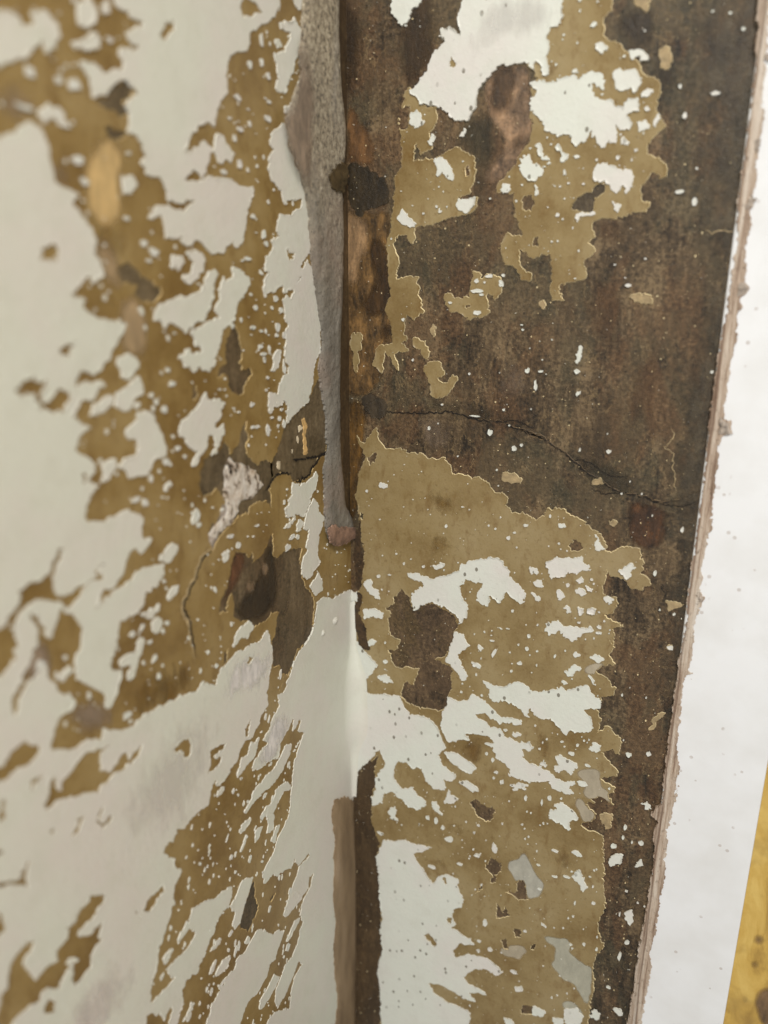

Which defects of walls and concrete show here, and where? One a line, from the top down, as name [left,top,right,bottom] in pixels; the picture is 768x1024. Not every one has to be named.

water stain [405,0,431,79]
water stain [464,68,513,159]
water stain [347,163,389,217]
peeling [372,0,668,399]
flaking render [328,0,363,513]
peeling [0,0,351,1024]
crack [266,446,327,490]
crack [355,410,699,507]
peeling [613,0,768,1024]
crack [181,548,212,660]
peeling [344,427,651,1024]